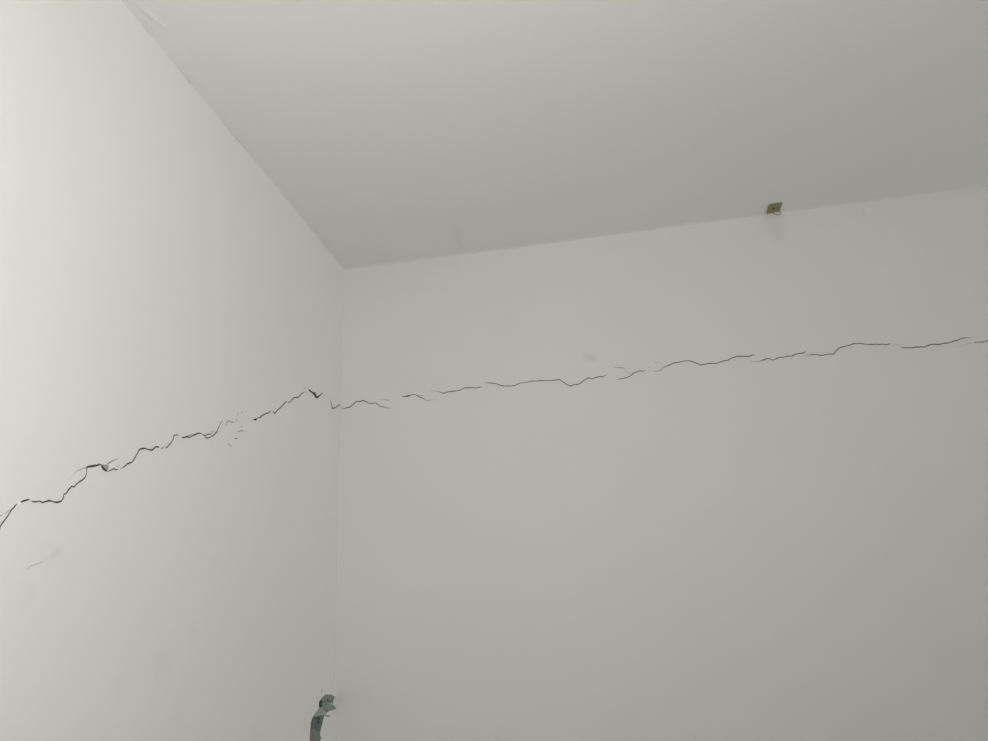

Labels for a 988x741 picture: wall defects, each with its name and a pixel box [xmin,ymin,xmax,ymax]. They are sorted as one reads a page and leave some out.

crack [0,337,988,528]